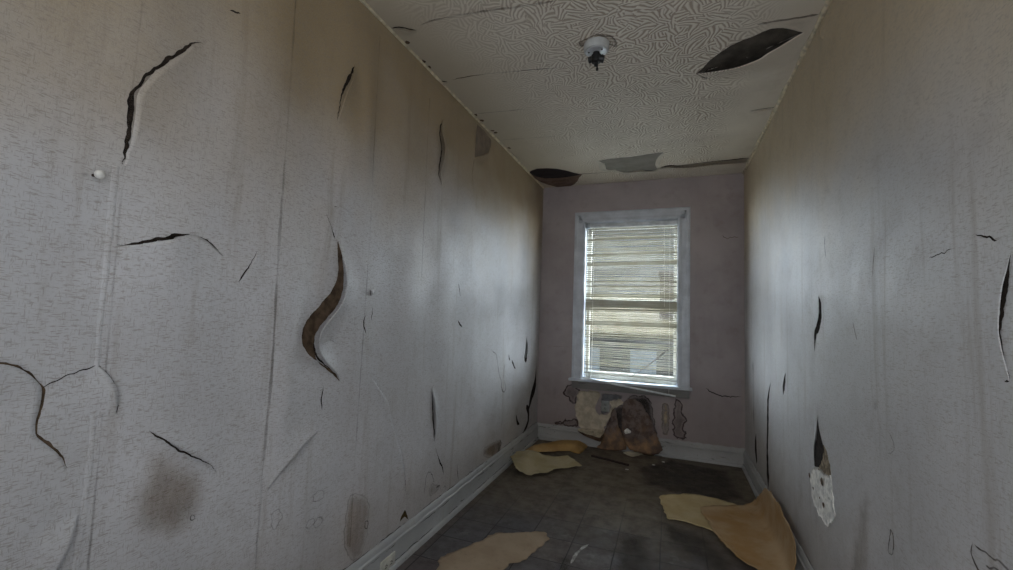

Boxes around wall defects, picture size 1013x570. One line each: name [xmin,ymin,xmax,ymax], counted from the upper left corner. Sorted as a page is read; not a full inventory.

peeling [575,390,623,431]